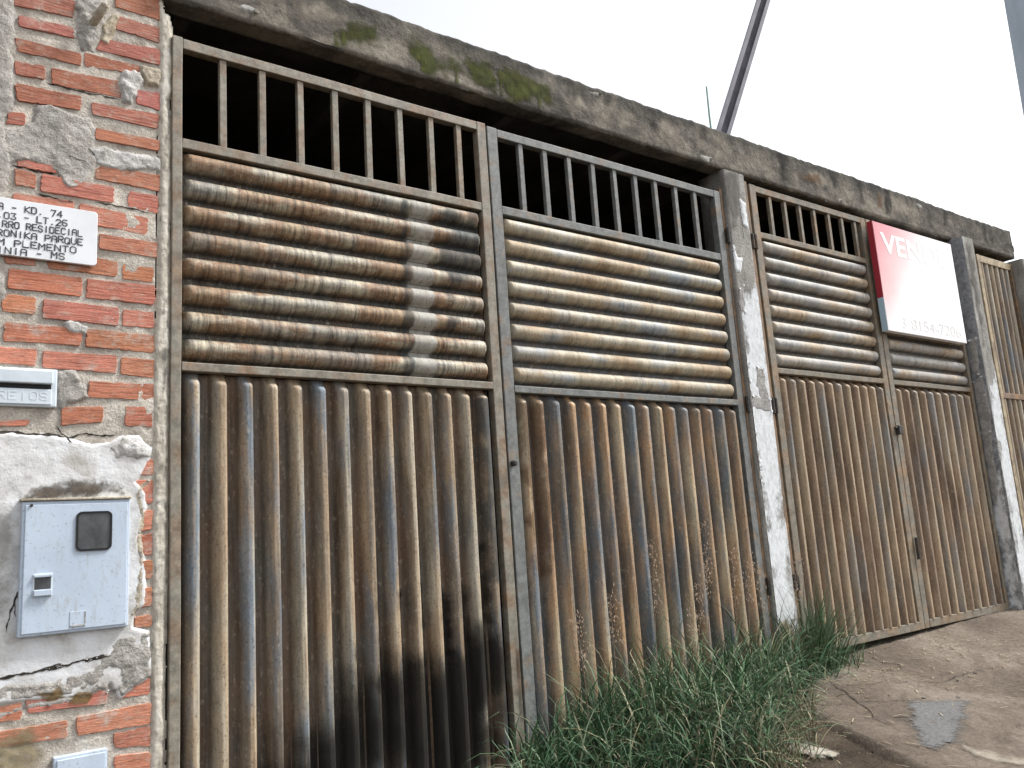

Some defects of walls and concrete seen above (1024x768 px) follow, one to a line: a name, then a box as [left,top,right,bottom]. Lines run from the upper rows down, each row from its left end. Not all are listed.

peeling [747,362,773,413]
crack [0,425,115,442]
peeling [972,376,1009,507]
flaking render [131,479,150,617]
crack [6,592,18,632]
crack [0,655,111,680]
flaking render [0,672,138,719]